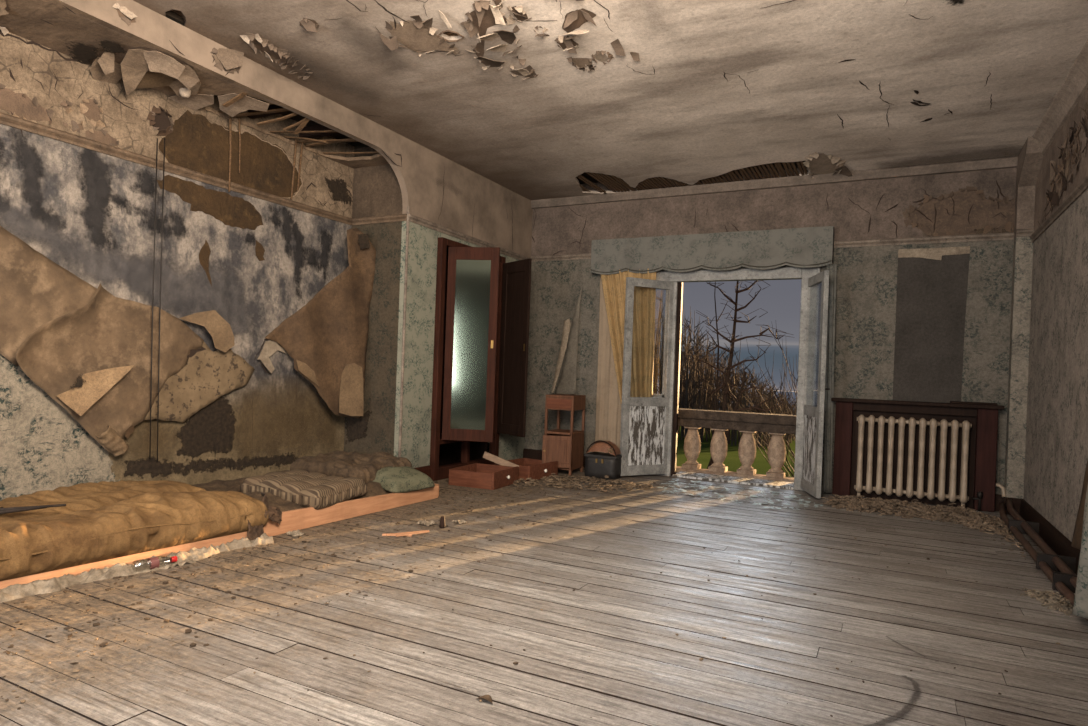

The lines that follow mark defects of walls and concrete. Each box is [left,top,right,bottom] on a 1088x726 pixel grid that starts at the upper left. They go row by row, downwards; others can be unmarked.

peeling [112,3,138,26]
crack [330,0,428,29]
water stain [67,41,125,65]
peeling [211,33,313,80]
peeling [375,0,655,80]
flaking render [90,46,303,261]
flaking render [803,152,852,179]
peeling [1038,97,1088,225]
water stain [325,176,353,206]
water stain [0,129,251,336]
flaking render [199,240,212,285]
water stain [269,206,332,298]